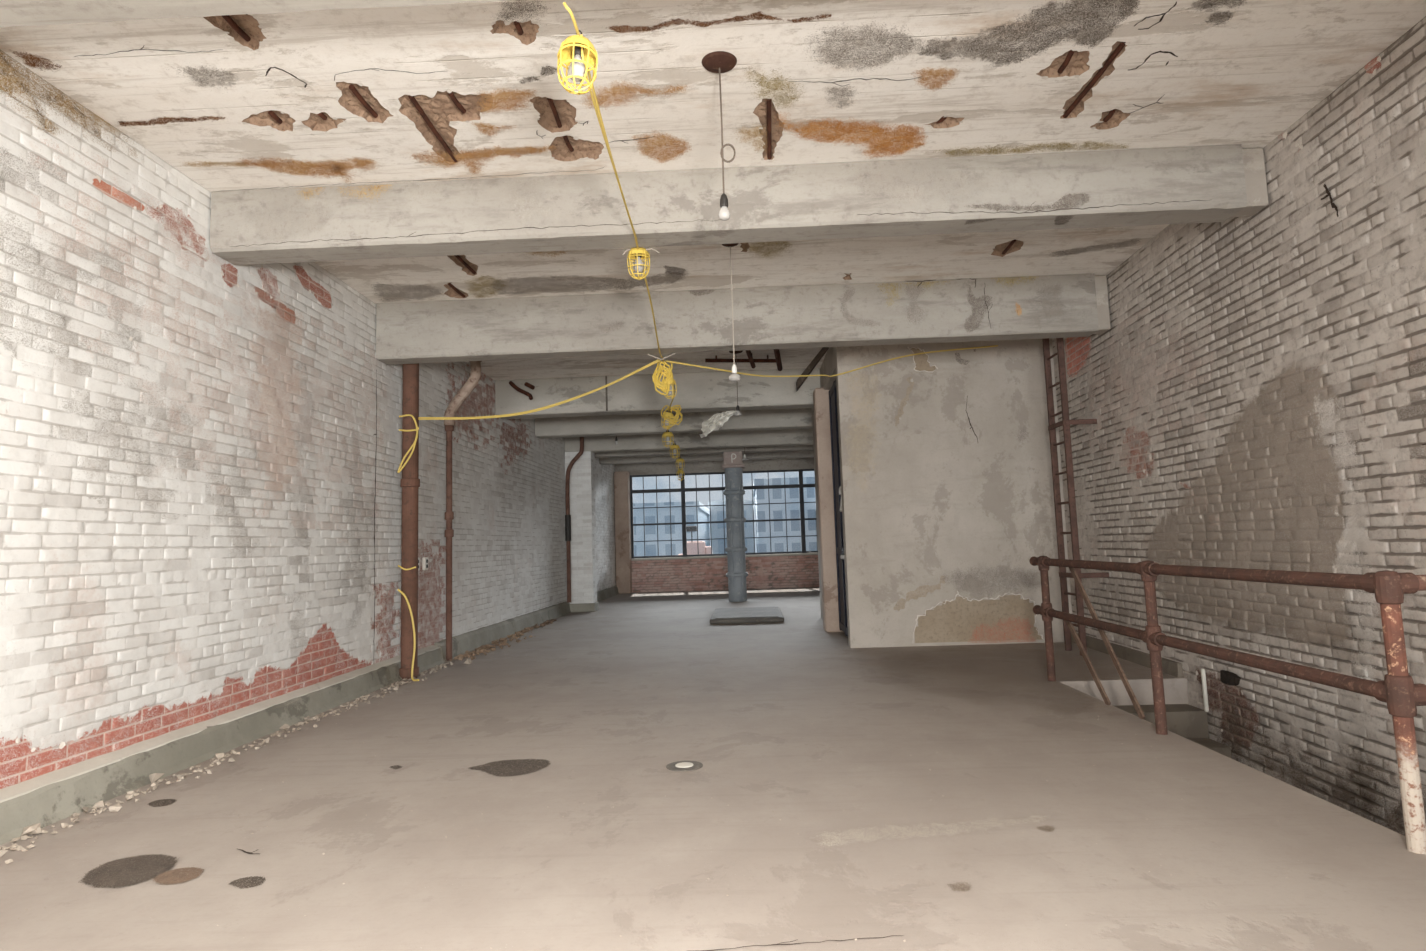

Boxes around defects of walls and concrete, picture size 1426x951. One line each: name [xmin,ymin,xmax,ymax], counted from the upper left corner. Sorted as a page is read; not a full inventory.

spalling [203,14,267,50]
spalling [242,81,492,162]
spalling [530,97,604,161]
spalling [753,98,784,160]
rust [734,65,1128,159]
damp [799,0,1140,110]
spalling [1037,41,1130,119]
spalling [1090,109,1131,130]
rust [179,156,392,202]
peeling [93,175,296,324]
damp [1146,360,1384,696]
peeling [0,573,401,789]